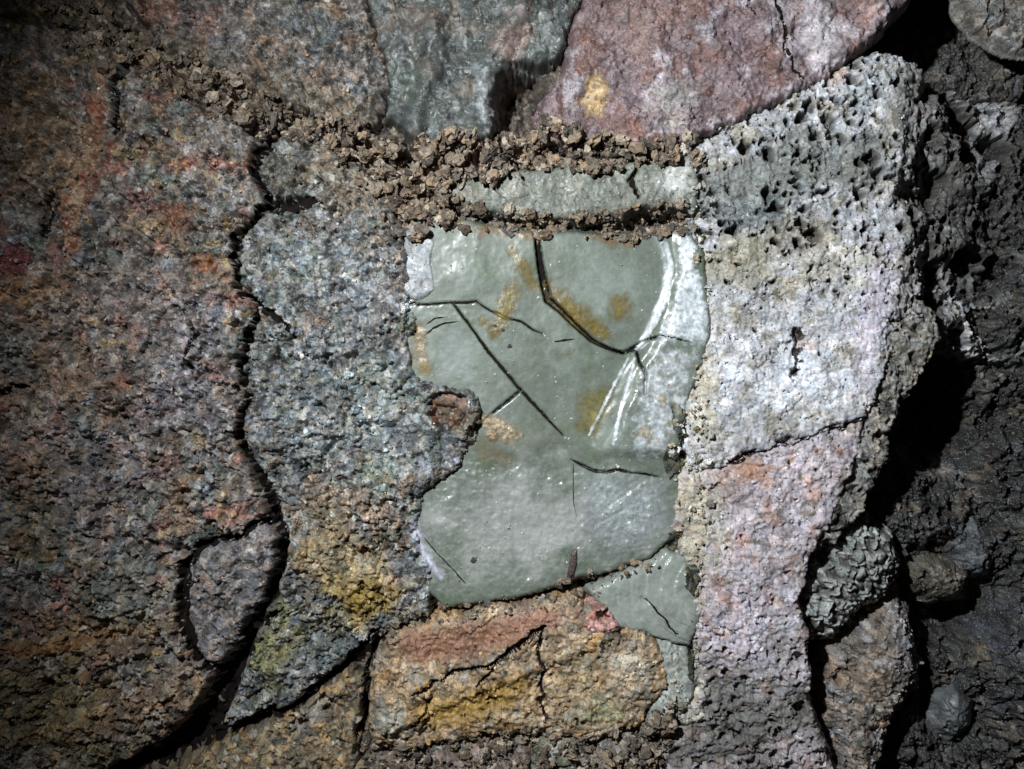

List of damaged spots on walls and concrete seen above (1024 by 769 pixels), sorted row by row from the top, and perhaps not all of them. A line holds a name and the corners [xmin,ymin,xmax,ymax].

crack [409,223,688,435]
crack [109,121,382,769]
crack [572,460,658,513]
crack [423,536,466,584]
crack [415,625,549,725]